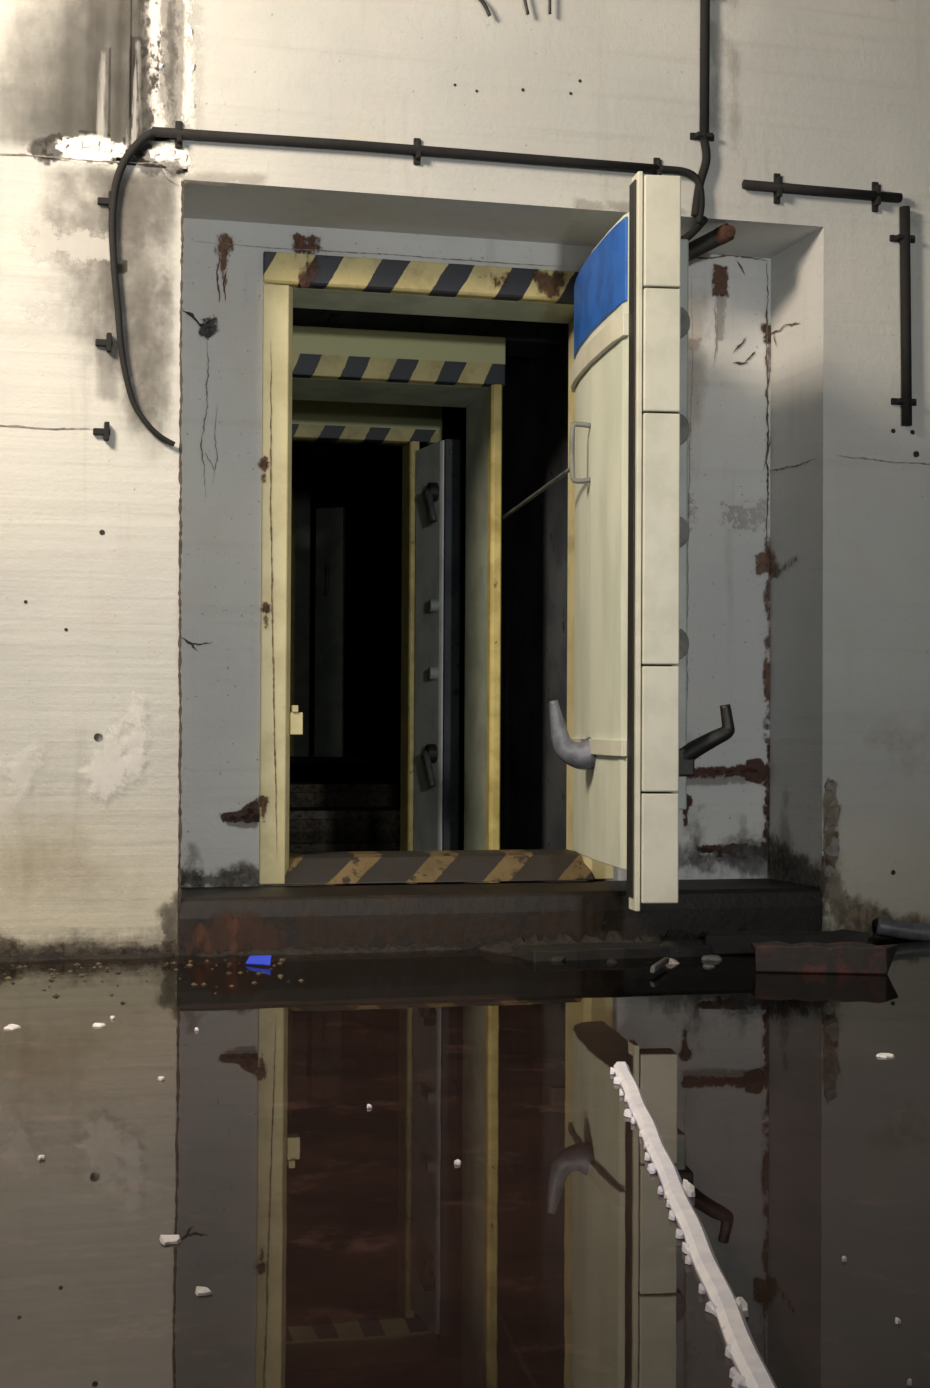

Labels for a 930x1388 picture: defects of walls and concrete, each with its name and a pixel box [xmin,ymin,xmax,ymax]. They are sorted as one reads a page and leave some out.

water stain [28,135,127,165]
water stain [143,142,192,171]
corrosion [215,233,233,285]
corrosion [293,233,321,287]
corrosion [533,269,565,298]
corrosion [712,264,729,297]
corrosion [761,324,771,372]
corrosion [683,539,797,862]
corrosion [258,795,268,822]
water stain [0,863,284,969]